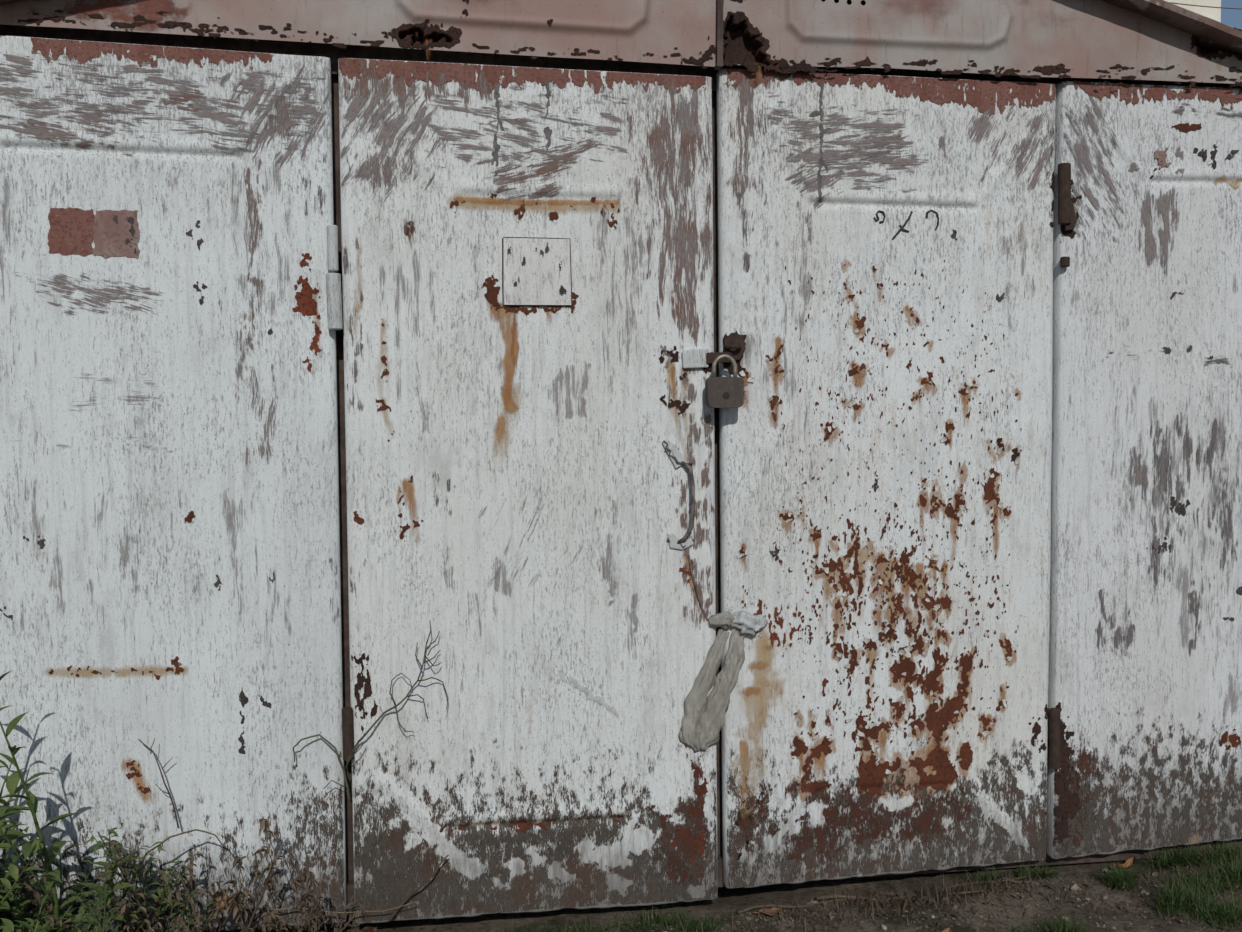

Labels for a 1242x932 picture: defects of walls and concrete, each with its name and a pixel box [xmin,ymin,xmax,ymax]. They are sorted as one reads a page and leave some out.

corrosion [292,253,322,372]
peeling [0,51,714,652]
corrosion [479,275,579,439]
corrosion [450,193,620,229]
corrosion [654,331,754,415]
peeling [726,55,928,429]
peeling [968,96,1242,272]
peeling [1107,387,1242,656]
peeling [736,585,813,649]
corrosion [779,438,1022,802]
peeling [1093,590,1137,659]
corrosion [1027,702,1082,846]